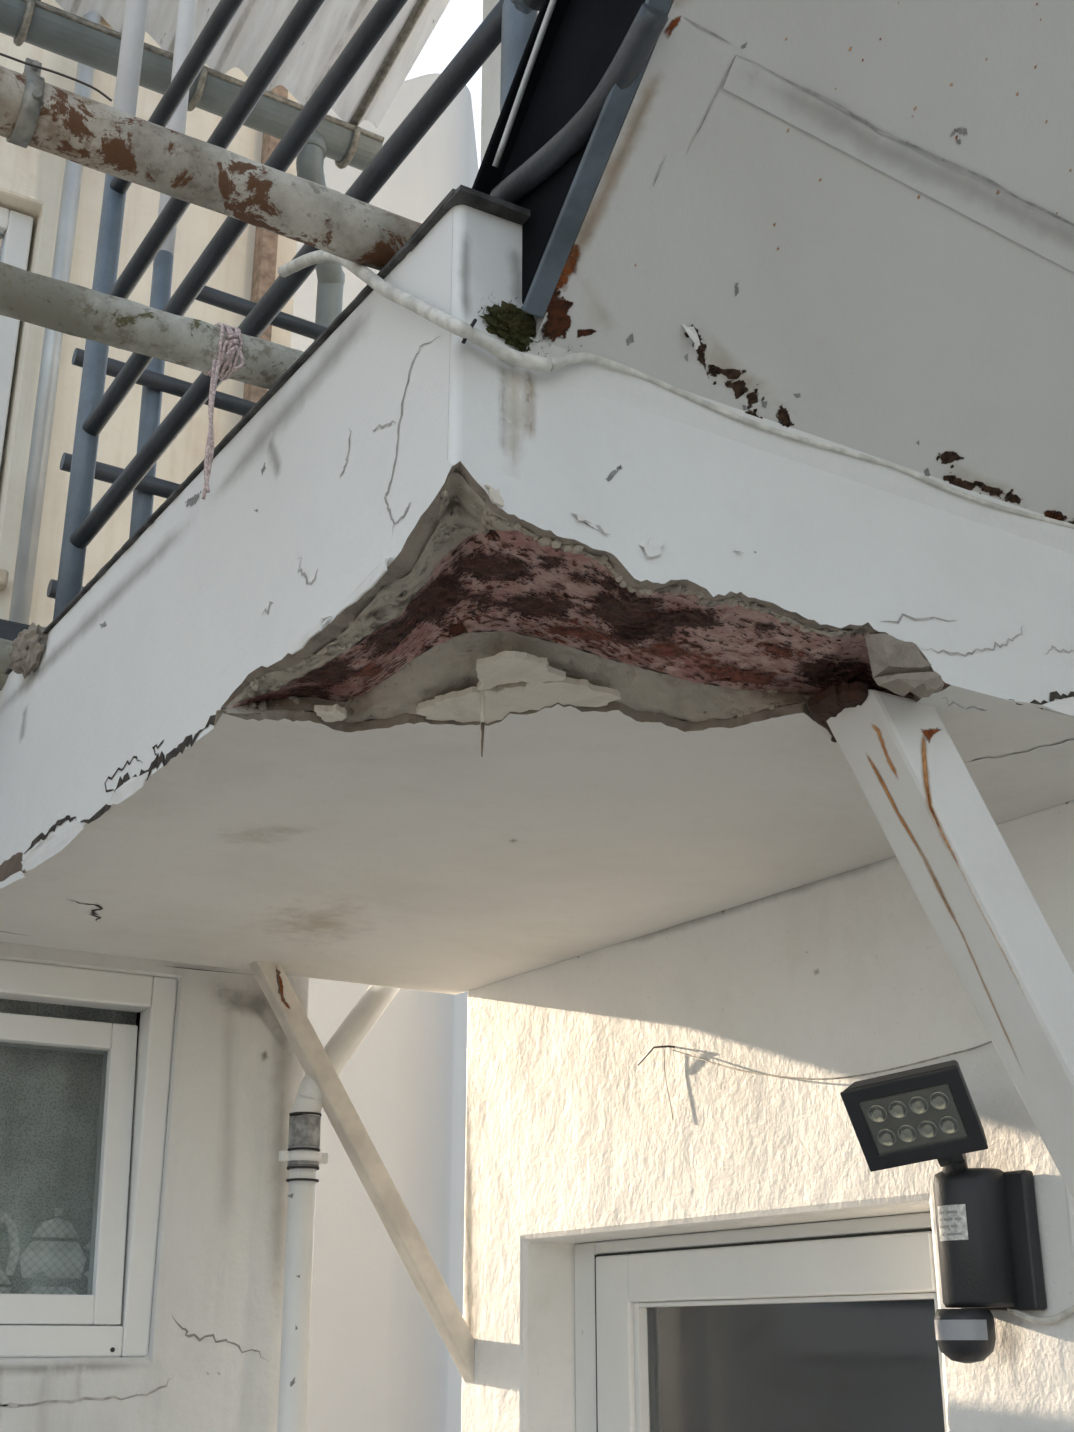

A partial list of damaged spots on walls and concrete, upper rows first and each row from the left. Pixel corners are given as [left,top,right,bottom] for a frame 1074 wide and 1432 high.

rust [541,245,596,342]
peeling [682,324,801,428]
crack [339,336,440,535]
peeling [924,451,1021,505]
spalling [214,461,950,757]
crack [882,613,1074,657]
crack [946,691,1074,763]
spalling [0,852,26,890]
rust [868,725,1018,1047]
crack [172,1315,270,1362]
crack [0,1378,173,1408]